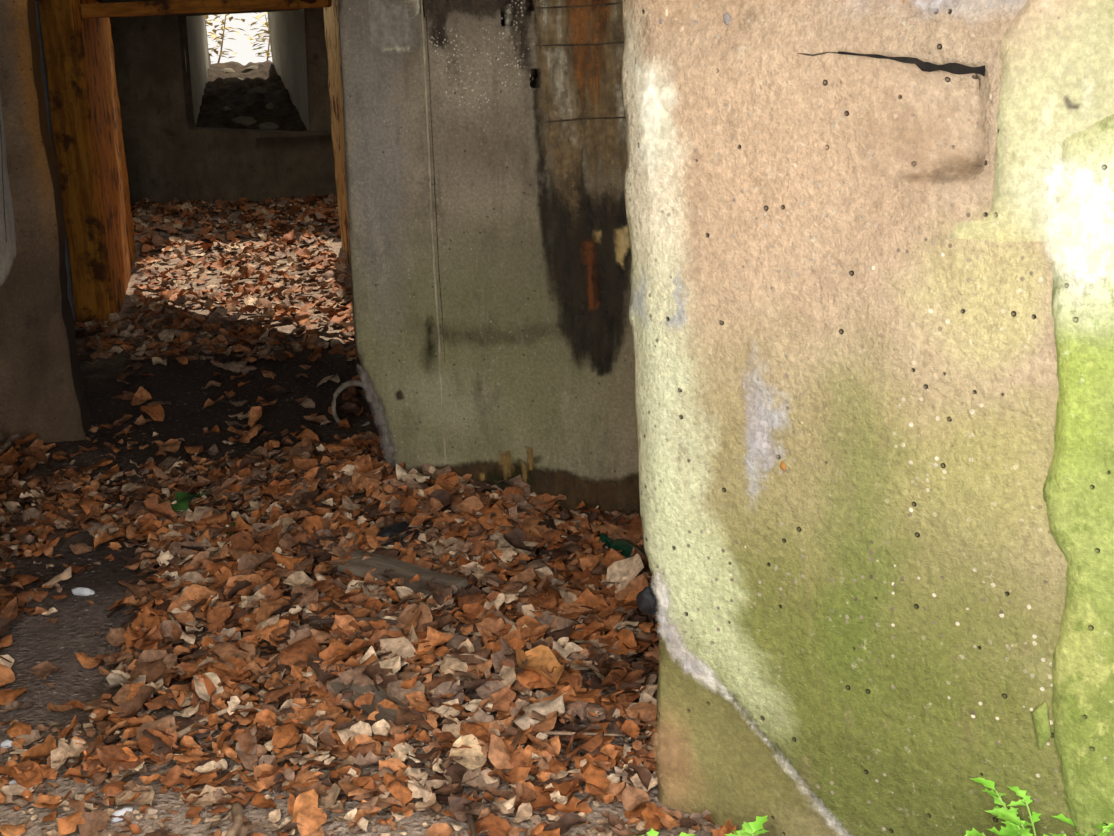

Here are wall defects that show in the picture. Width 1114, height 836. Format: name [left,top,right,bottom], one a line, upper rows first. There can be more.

corrosion [567,0,610,105]
crack [797,51,985,90]
leakage [367,0,673,375]
corrosion [582,239,599,311]
peeling [615,226,630,266]